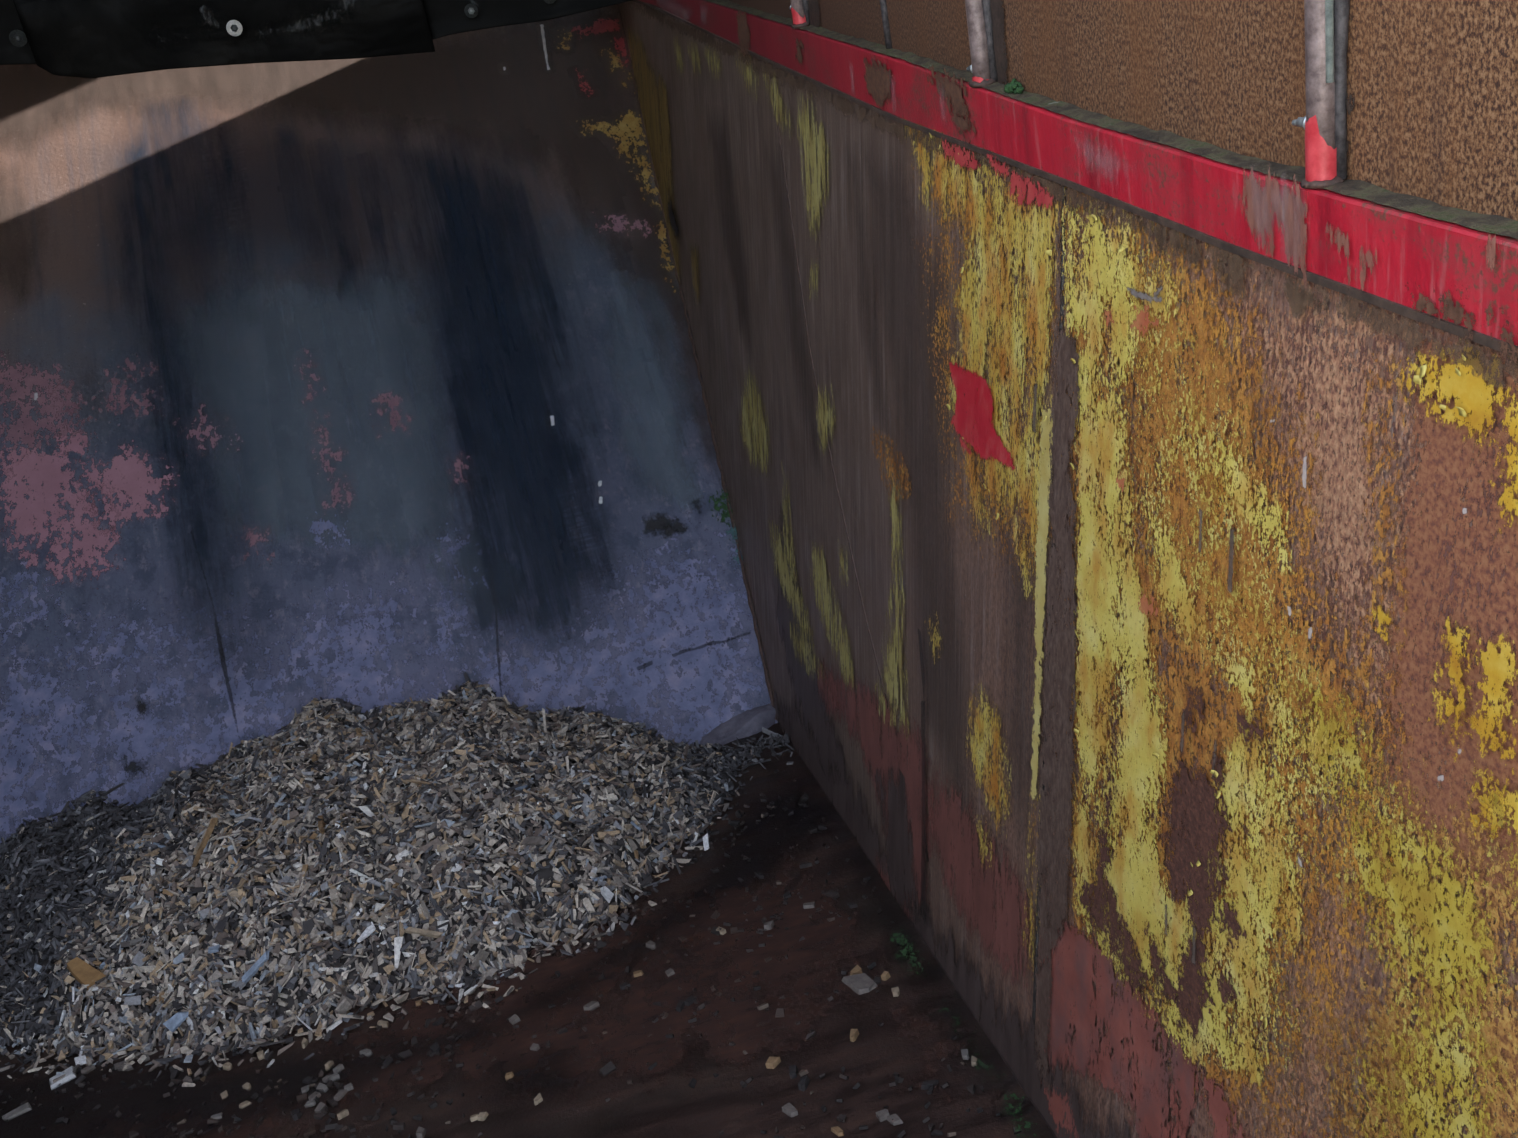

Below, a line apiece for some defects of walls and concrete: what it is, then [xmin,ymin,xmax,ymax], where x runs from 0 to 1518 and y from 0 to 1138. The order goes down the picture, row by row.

peeling [553,18,680,293]
rust [864,57,892,110]
rust [925,64,977,136]
rust [990,0,1008,84]
water stain [127,148,585,625]
peeling [0,350,771,857]
rust [644,513,687,536]
peeling [905,125,1518,1138]
rust [909,152,1518,1138]
rust [149,847,885,1138]